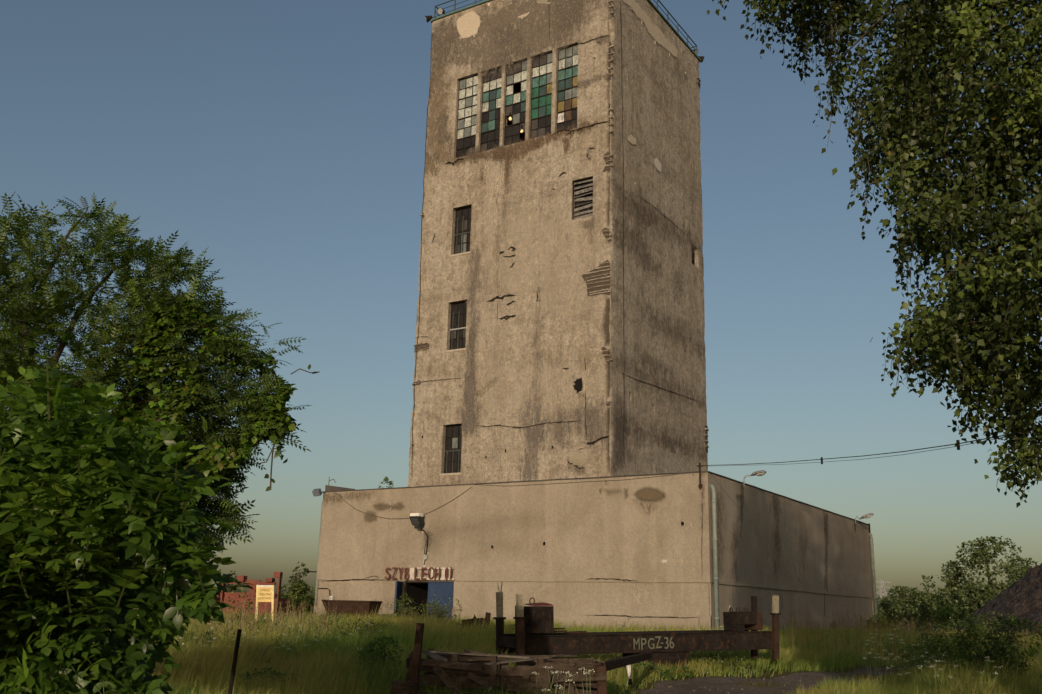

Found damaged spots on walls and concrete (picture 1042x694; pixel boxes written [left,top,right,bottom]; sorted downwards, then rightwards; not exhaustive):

spalling [456,10,482,39]
spalling [609,0,678,57]
spalling [582,260,612,296]
leakage [461,162,706,481]
crack [478,358,609,450]
spalling [572,378,583,394]
leakage [323,492,403,521]
leakage [626,488,665,512]
leakage [712,484,744,573]